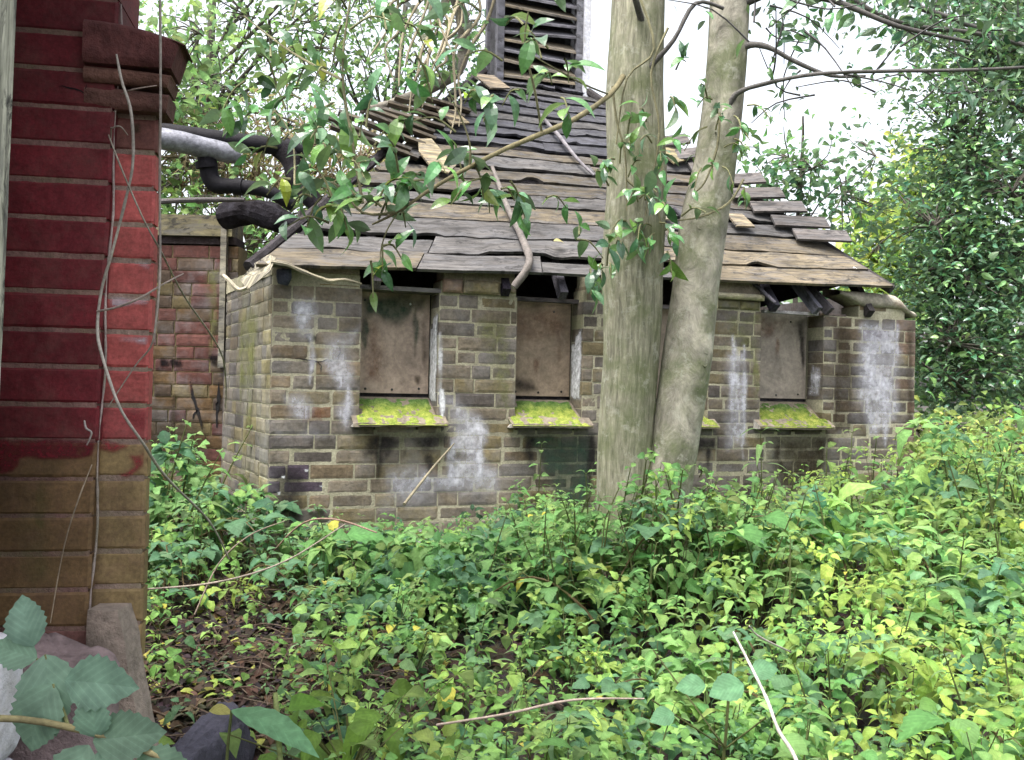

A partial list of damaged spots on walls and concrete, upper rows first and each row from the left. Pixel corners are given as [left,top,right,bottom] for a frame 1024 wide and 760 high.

leakage [297,303,312,323]
leakage [329,358,350,419]
leakage [730,365,758,410]
leakage [835,327,912,439]
peeling [0,439,142,476]
leakage [368,436,396,472]
leakage [415,409,493,485]